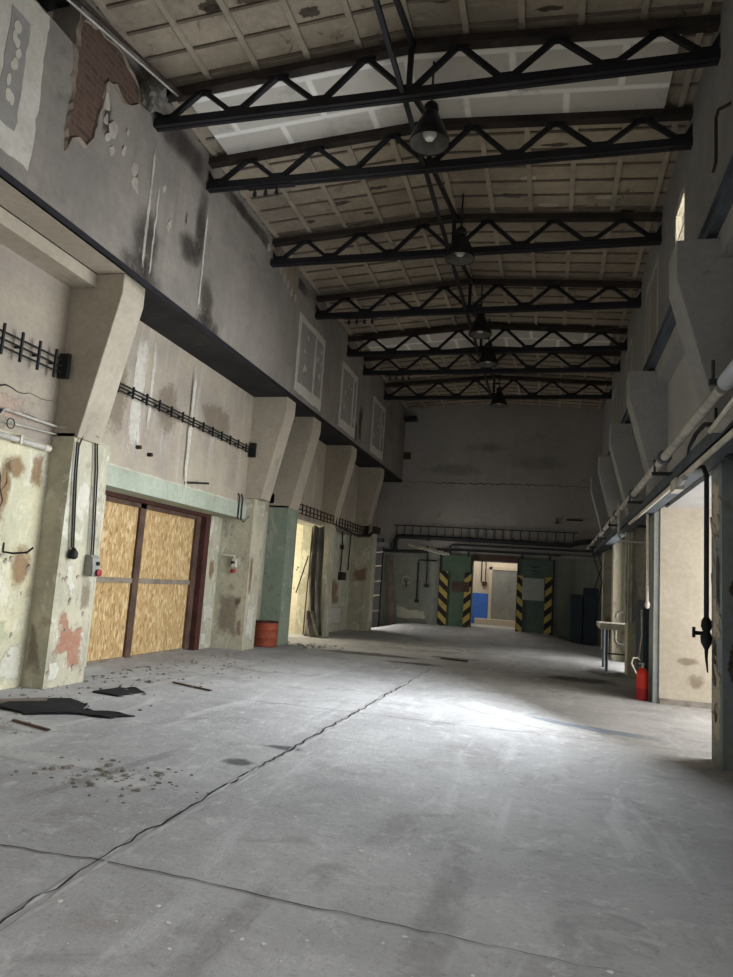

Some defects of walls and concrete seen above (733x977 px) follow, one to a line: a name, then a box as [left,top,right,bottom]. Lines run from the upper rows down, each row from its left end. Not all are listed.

spalling [64,15,141,194]
water stain [198,216,208,305]
crack [0,384,54,424]
peeling [46,564,84,681]
crack [0,665,639,977]